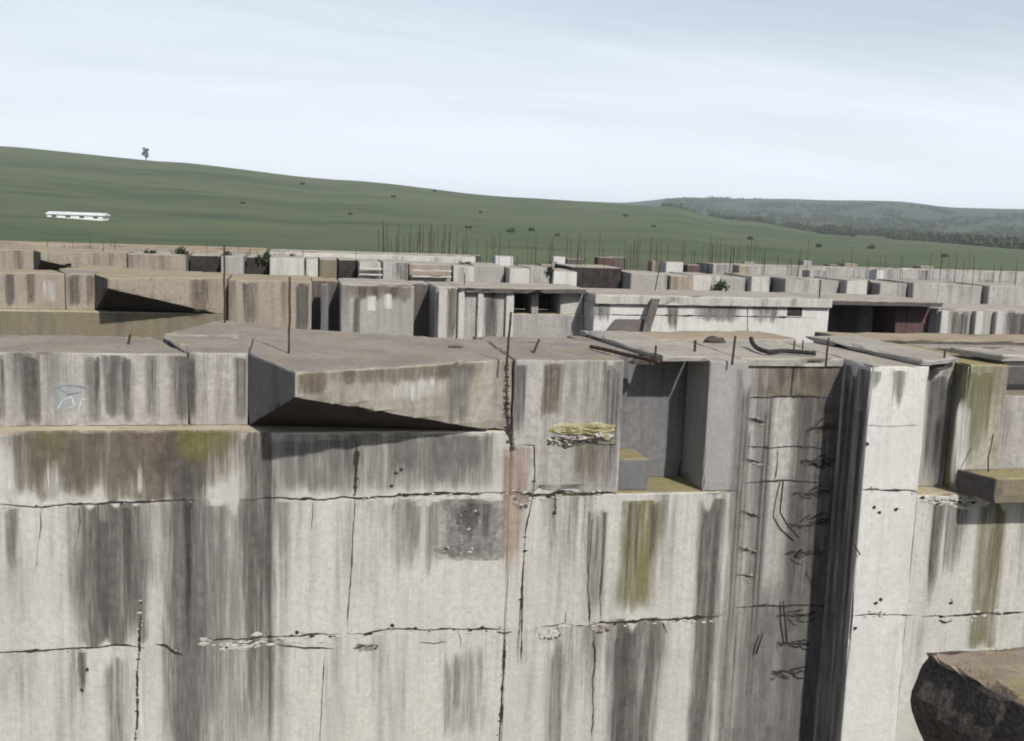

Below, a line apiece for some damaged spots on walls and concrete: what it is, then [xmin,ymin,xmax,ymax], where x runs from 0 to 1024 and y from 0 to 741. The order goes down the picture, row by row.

water stain [288,433,478,487]
water stain [7,355,275,741]
crack [0,365,838,741]
spalling [433,503,480,555]
water stain [429,499,502,560]
water stain [588,512,606,594]
water stain [689,365,879,741]
crack [861,487,977,510]
crack [850,598,1024,623]
spalling [218,640,268,652]
water stain [612,617,662,741]